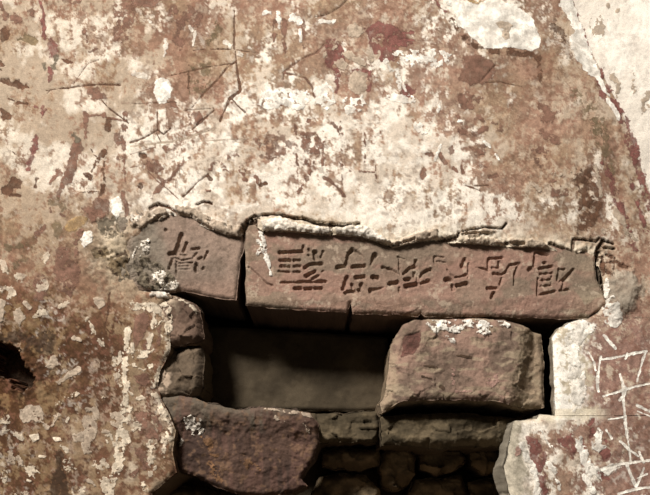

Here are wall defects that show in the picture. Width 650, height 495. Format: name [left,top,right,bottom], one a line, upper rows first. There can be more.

peeling [435,0,541,51]
crack [246,214,360,235]
crack [436,223,510,245]
leakage [427,319,511,343]
flaking render [401,332,421,357]
spalling [0,344,35,388]
peeling [575,418,620,494]